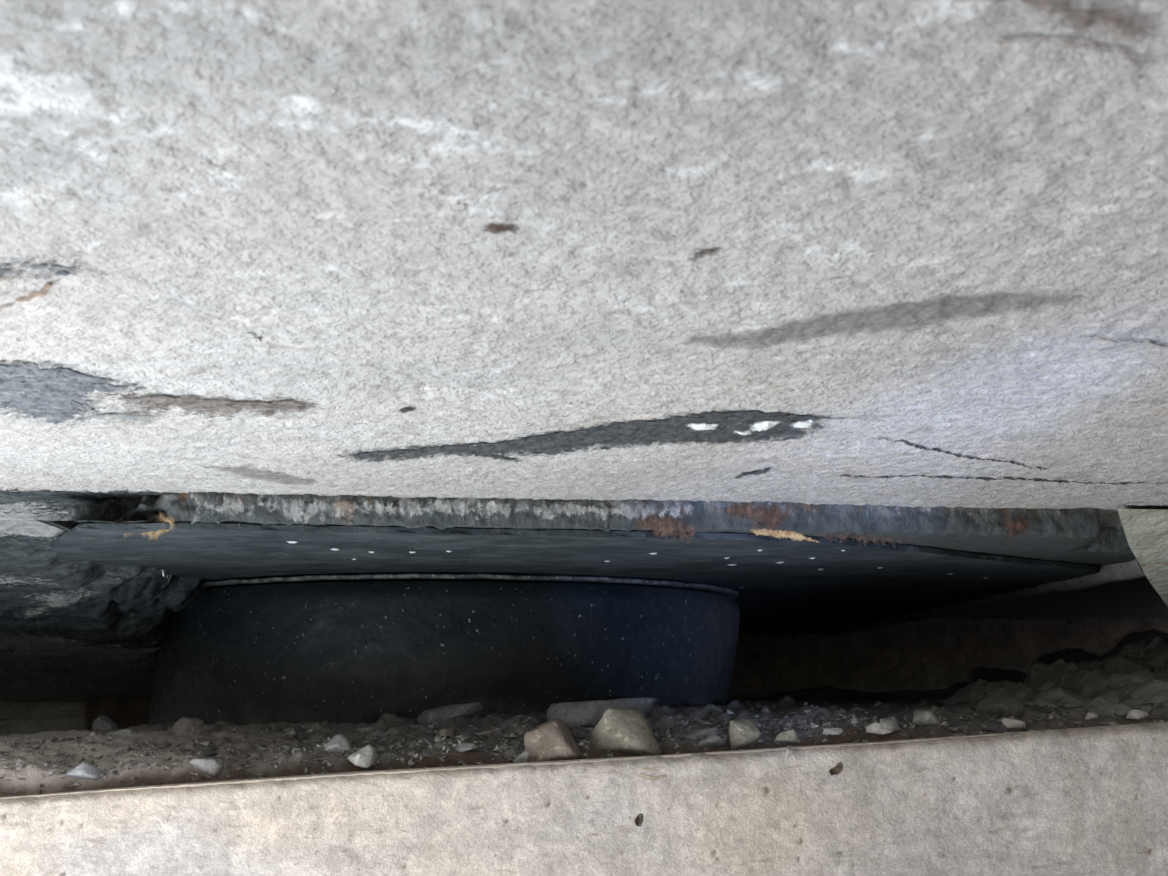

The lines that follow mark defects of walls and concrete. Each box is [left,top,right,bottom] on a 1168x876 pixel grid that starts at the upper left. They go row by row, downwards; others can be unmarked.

rust [0,283,57,311]
rust [633,514,695,544]
rust [707,501,907,546]
peeling [0,488,211,652]
spalling [1126,709,1149,720]